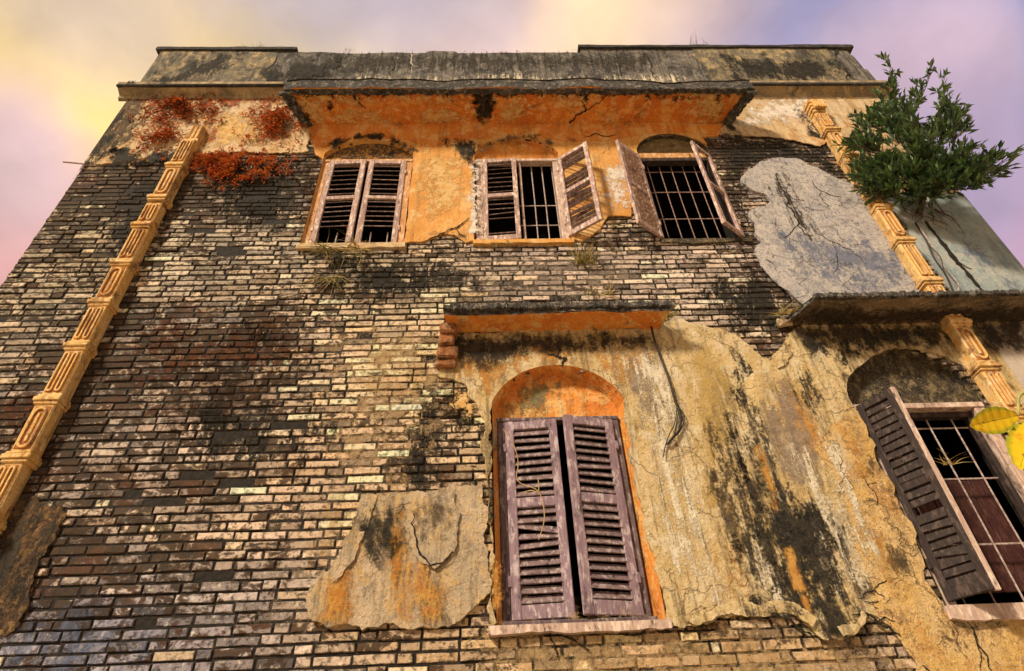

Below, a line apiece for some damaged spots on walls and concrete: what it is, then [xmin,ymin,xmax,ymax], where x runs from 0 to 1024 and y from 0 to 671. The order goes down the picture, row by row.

flaking render [198,112,289,154]
damp [248,50,730,104]
damp [465,93,629,124]
crack [569,54,623,137]
flaking render [711,97,919,305]
crack [775,163,866,272]
crack [924,221,983,290]
flaking render [711,329,792,376]
damp [359,398,455,568]
damp [455,332,879,645]
crack [410,512,453,566]
flaking render [667,600,867,640]